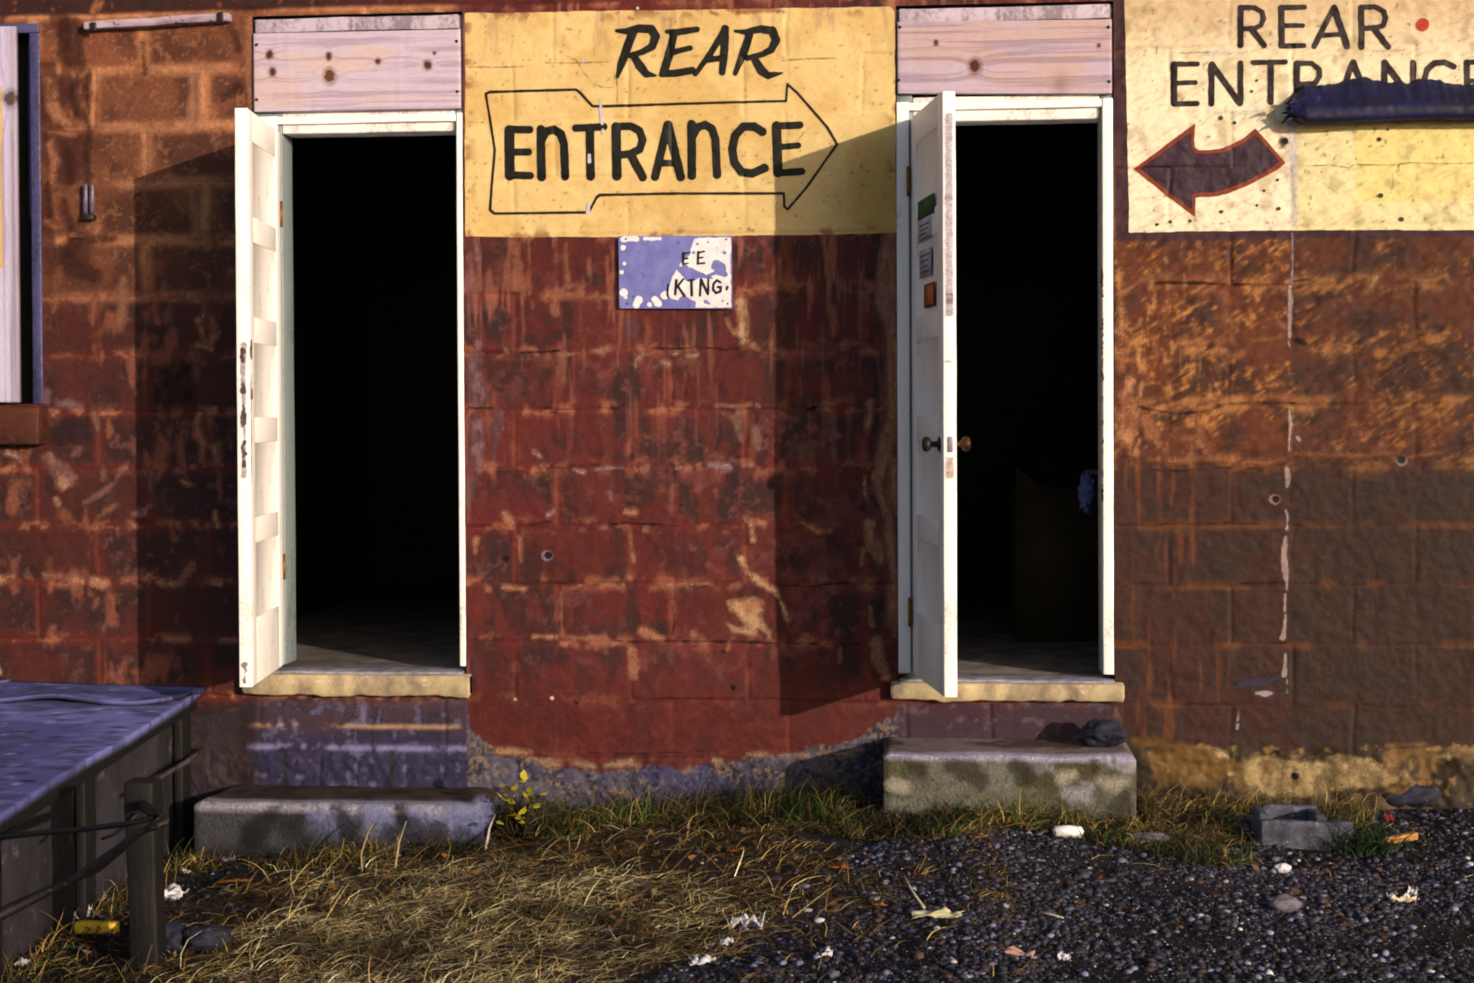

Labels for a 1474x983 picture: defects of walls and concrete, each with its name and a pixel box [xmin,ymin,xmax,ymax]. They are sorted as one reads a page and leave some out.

peeling [1227,232,1294,360]
peeling [1349,265,1440,300]
peeling [1100,266,1229,502]
peeling [1247,381,1434,488]
peeling [0,560,223,590]
peeling [727,521,788,637]
peeling [1280,509,1289,693]
spalling [485,744,641,770]
spalling [1215,748,1415,797]